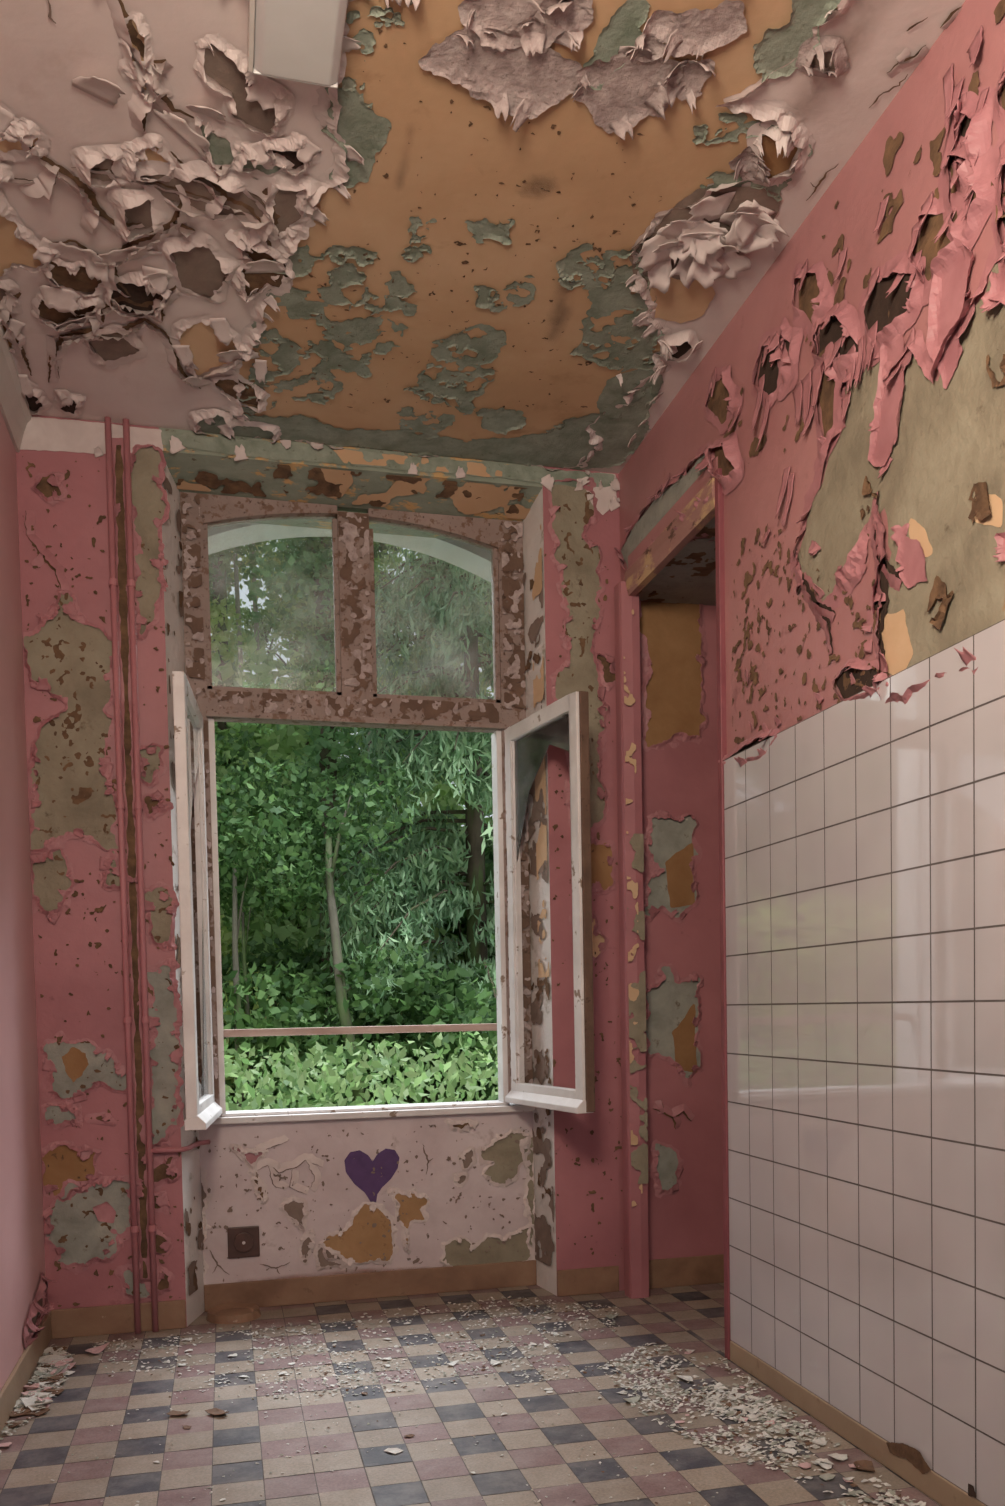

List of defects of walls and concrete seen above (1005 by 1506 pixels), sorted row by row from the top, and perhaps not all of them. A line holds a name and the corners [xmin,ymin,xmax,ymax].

peeling [994,0,1005,24]
peeling [0,0,857,1348]
peeling [614,25,1005,767]